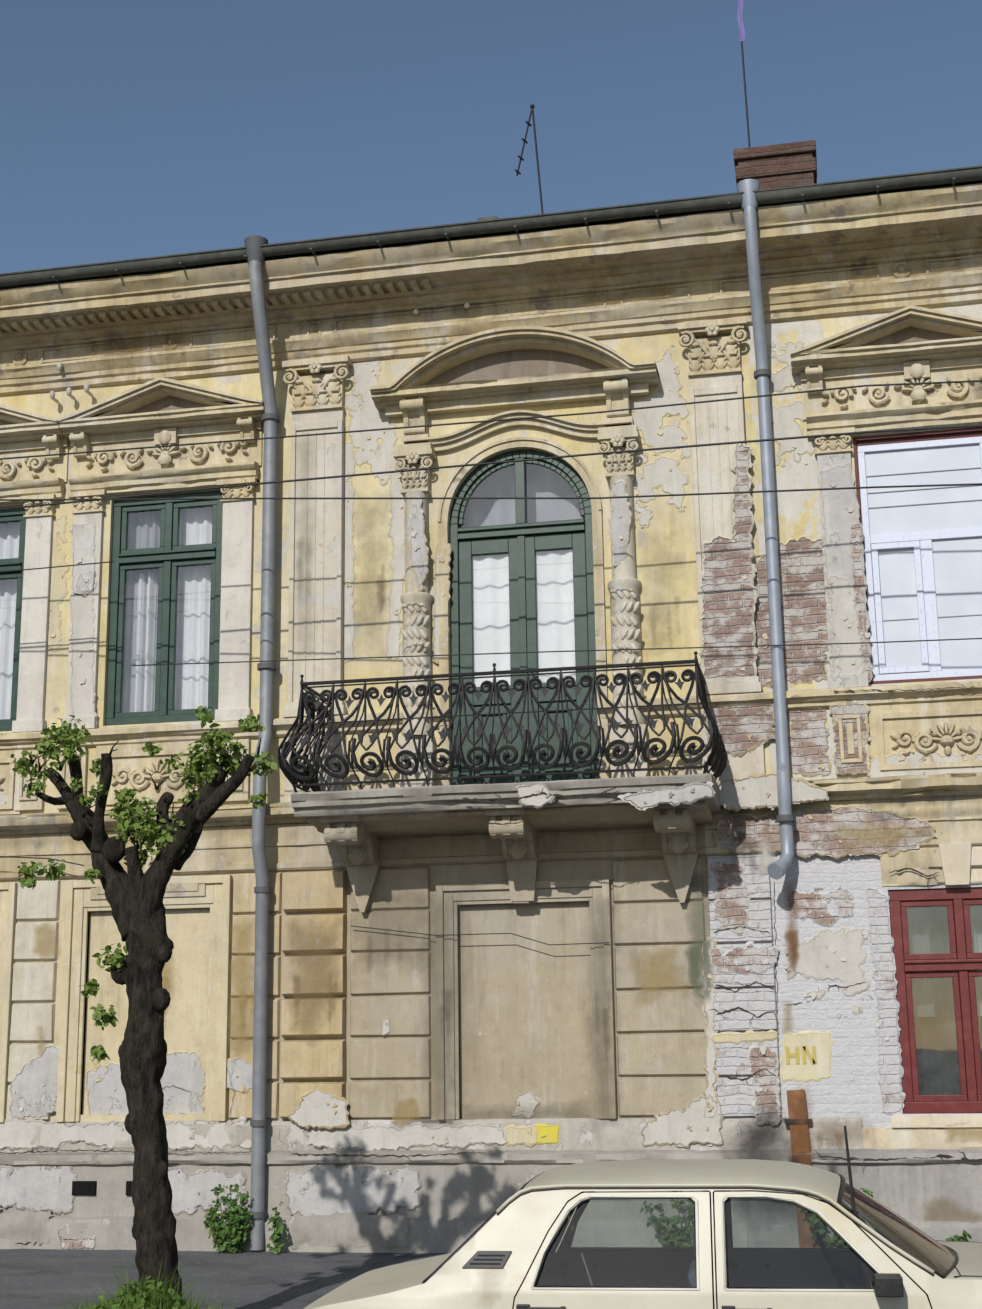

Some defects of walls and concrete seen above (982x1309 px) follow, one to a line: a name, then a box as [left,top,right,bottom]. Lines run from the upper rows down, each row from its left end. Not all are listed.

peeling [343,360,451,664]
peeling [608,342,692,566]
flaking render [641,341,982,1149]
flaking render [0,1043,132,1250]
flaking render [160,1050,253,1216]
flaking render [278,1089,560,1216]